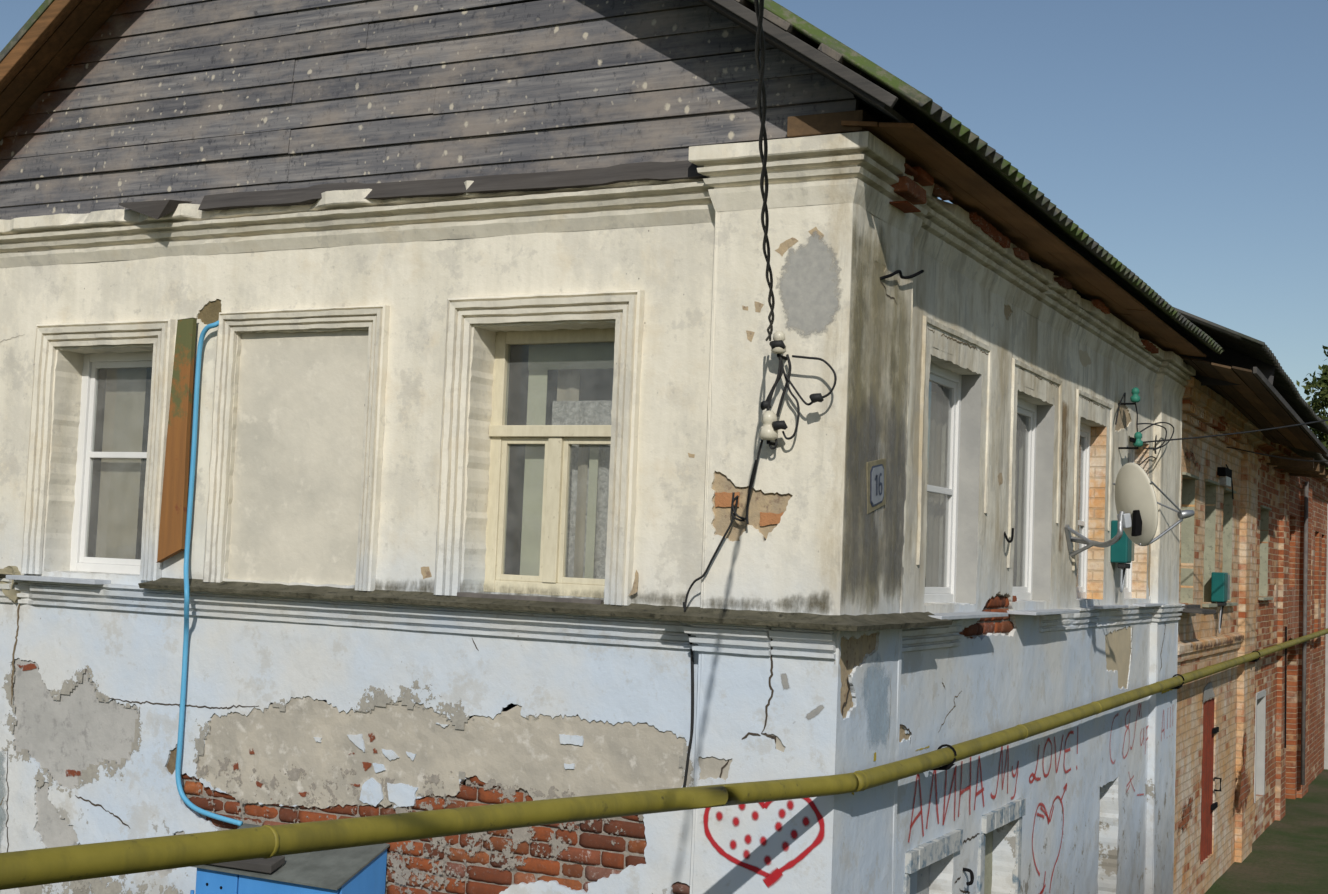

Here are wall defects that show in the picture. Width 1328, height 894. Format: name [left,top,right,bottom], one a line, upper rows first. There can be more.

peeling [775,227,840,336]
leakage [844,233,910,603]
flaking render [713,472,793,541]
crack [11,604,20,705]
crack [742,638,776,743]
leakage [808,595,828,612]
flaking render [839,633,910,742]
flaking render [959,595,1017,639]
peeling [2,658,142,848]
peeling [166,680,732,831]
peeling [19,868,183,894]
flaking render [385,814,647,894]